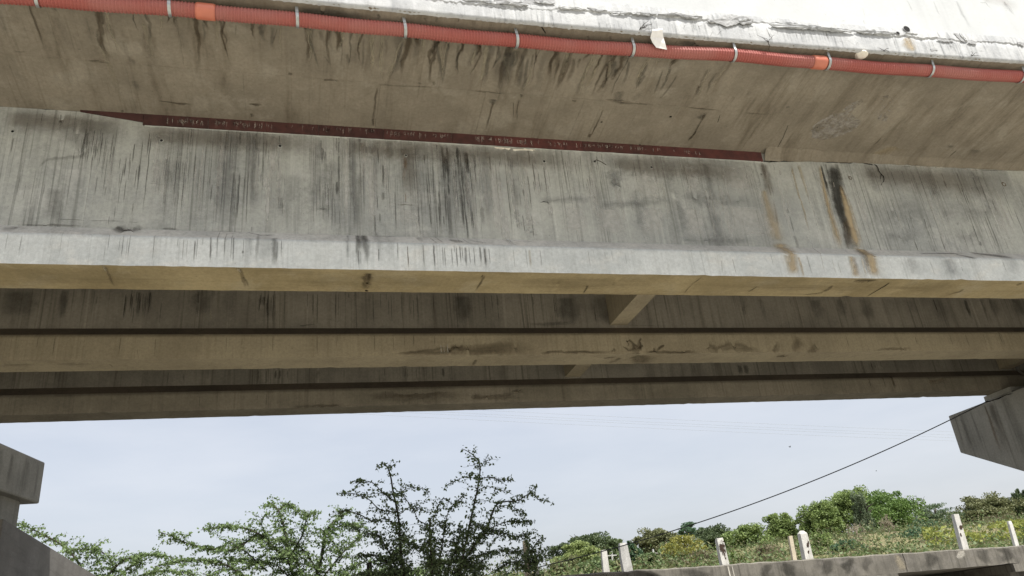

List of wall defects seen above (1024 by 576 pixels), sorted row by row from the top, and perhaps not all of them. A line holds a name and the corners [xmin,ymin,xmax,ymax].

rust [821,167,877,273]